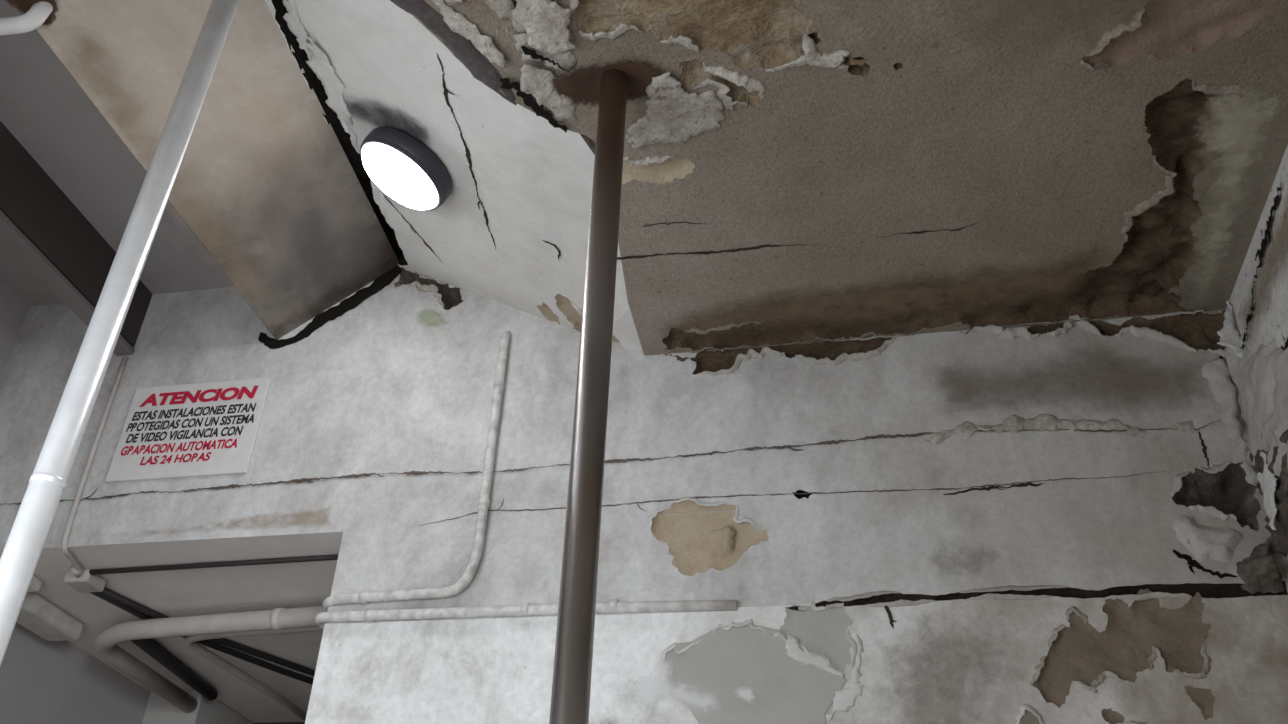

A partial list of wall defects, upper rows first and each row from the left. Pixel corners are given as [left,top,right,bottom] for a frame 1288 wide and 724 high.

peeling [283,0,360,154]
flaking render [431,0,870,184]
water stain [1192,90,1281,297]
water stain [674,260,1089,340]
crack [60,464,570,526]
crack [602,470,1174,511]
crack [605,420,1219,468]
water stain [945,359,1187,401]
crack [1173,550,1238,579]
spalling [1169,429,1288,594]
peeling [661,591,935,724]
peeling [1016,588,1216,724]